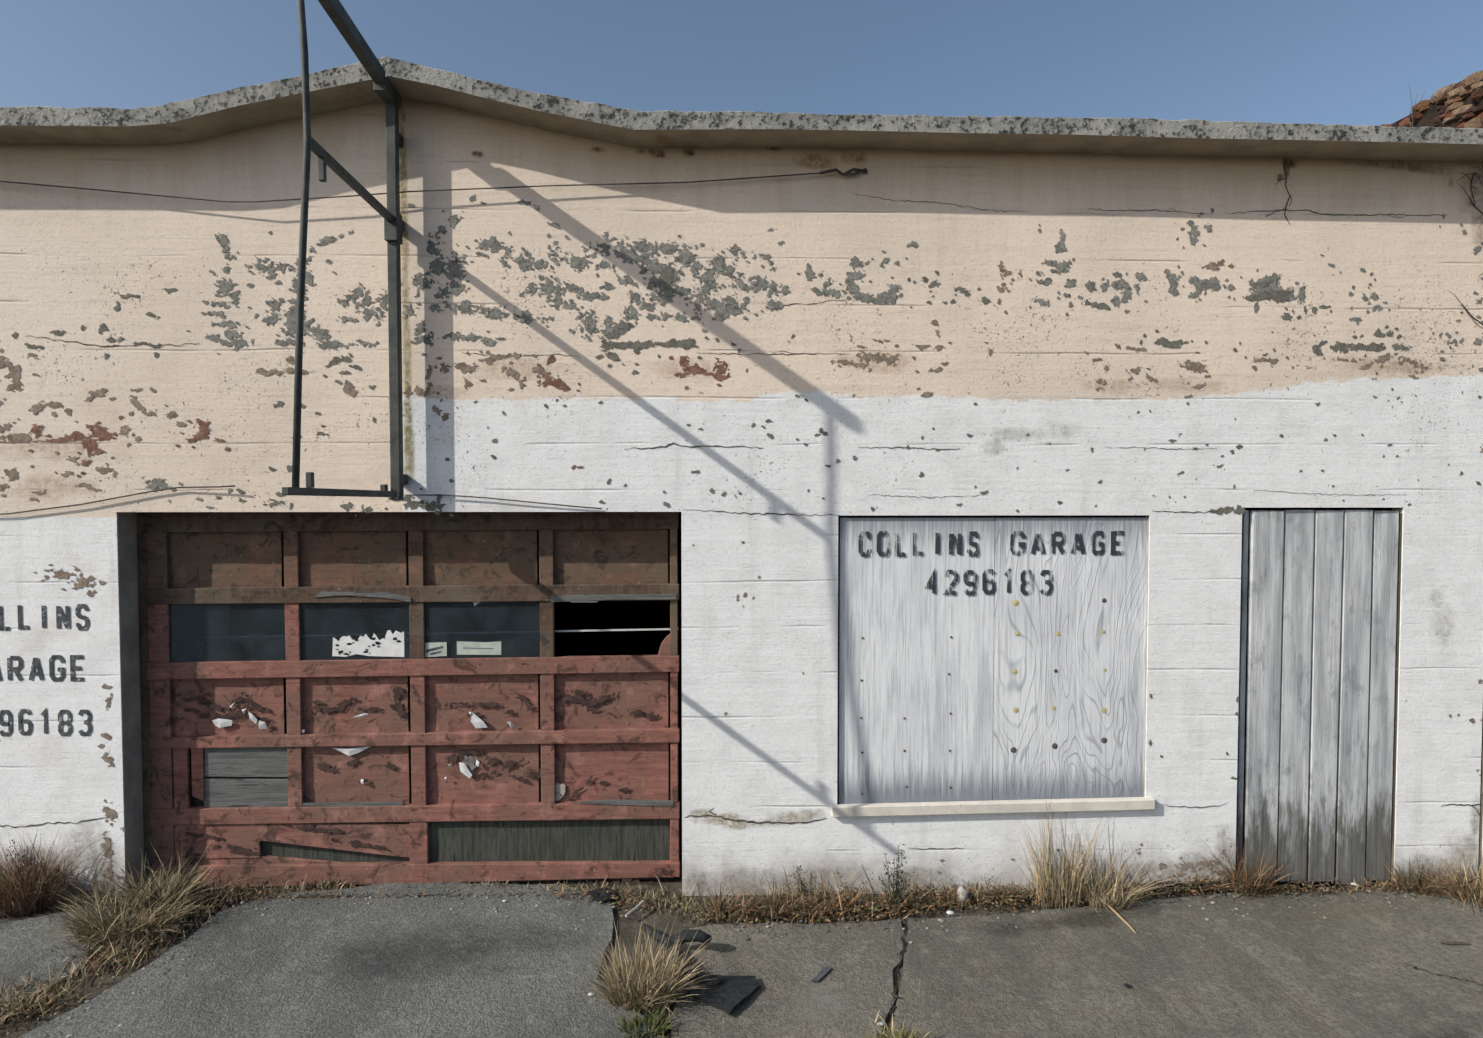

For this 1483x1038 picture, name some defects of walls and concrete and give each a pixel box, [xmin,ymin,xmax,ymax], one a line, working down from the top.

crack [1090,158,1442,224]
peeling [0,293,162,404]
peeling [186,194,1147,421]
peeling [1084,329,1211,405]
spalling [1164,208,1332,320]
peeling [1232,342,1294,370]
spalling [1312,247,1483,401]
peeling [0,387,230,497]
peeling [195,488,293,510]
peeling [340,479,454,517]
crack [685,808,826,824]
crack [888,919,907,1018]